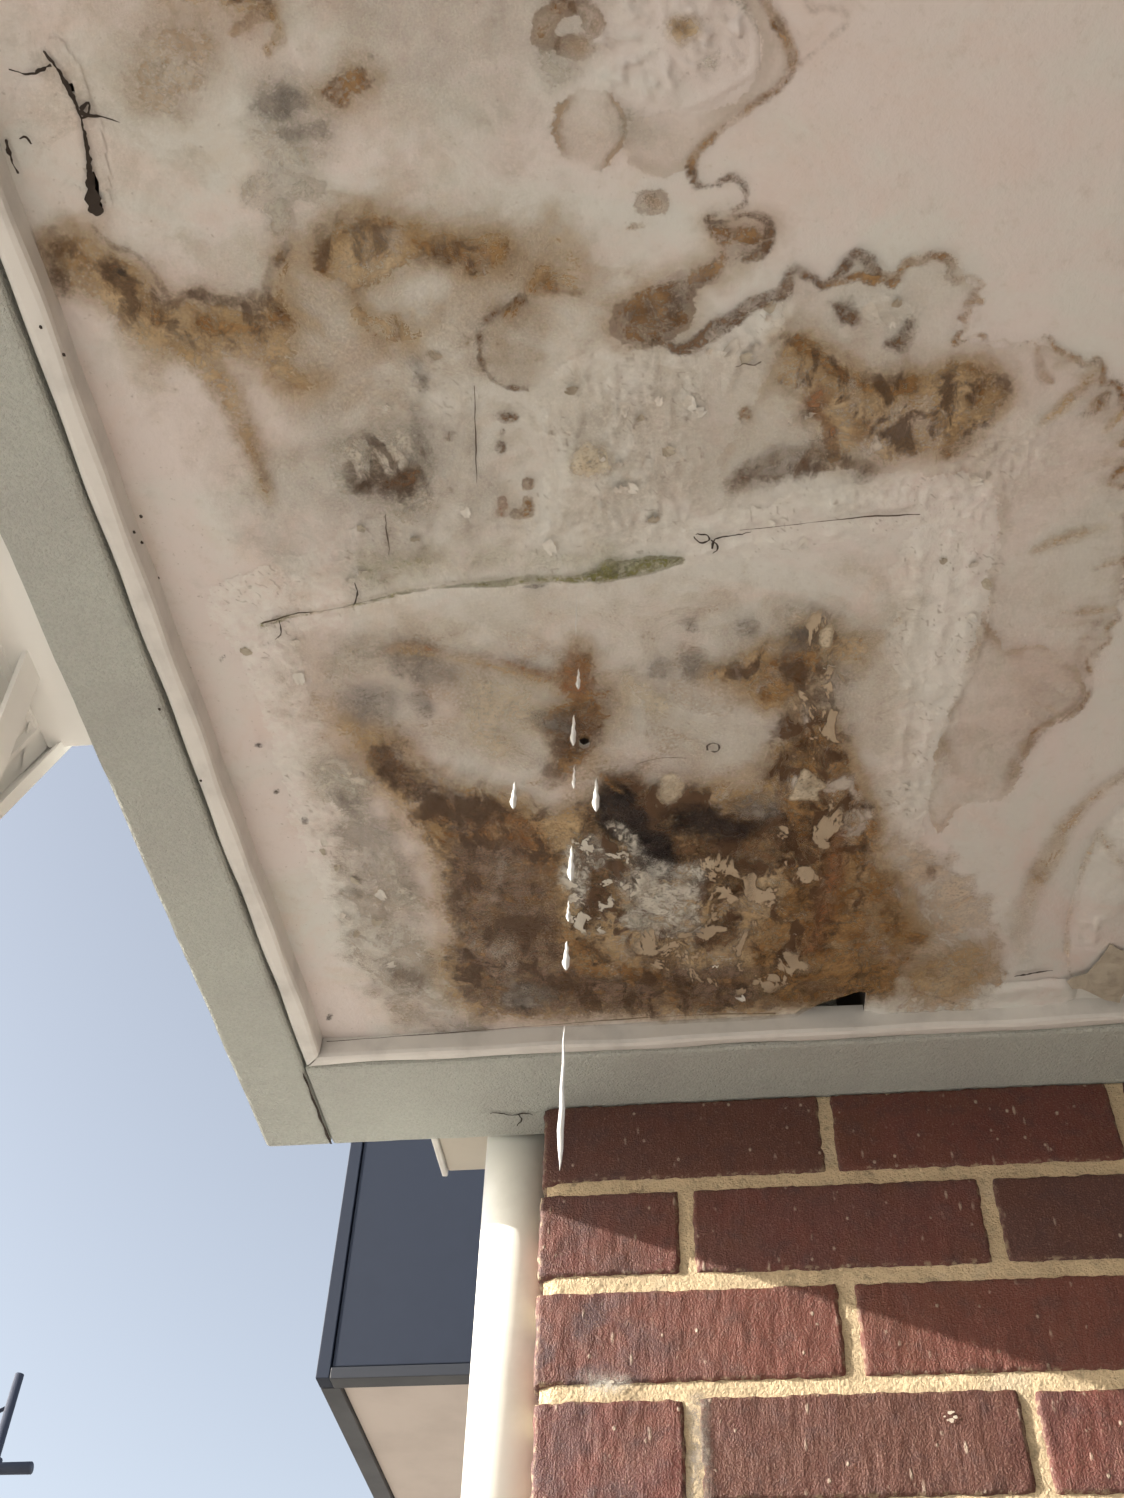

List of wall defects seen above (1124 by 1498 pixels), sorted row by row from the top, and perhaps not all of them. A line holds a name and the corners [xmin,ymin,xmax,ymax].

crack [5,50,120,216]
damp [745,16,797,112]
damp [50,67,375,497]
damp [330,426,435,524]
damp [311,211,514,342]
damp [476,238,581,391]
damp [609,133,952,355]
damp [731,298,1009,489]
damp [1047,338,1124,447]
crack [261,583,415,640]
damp [313,608,1006,1030]
peeling [561,649,852,1002]